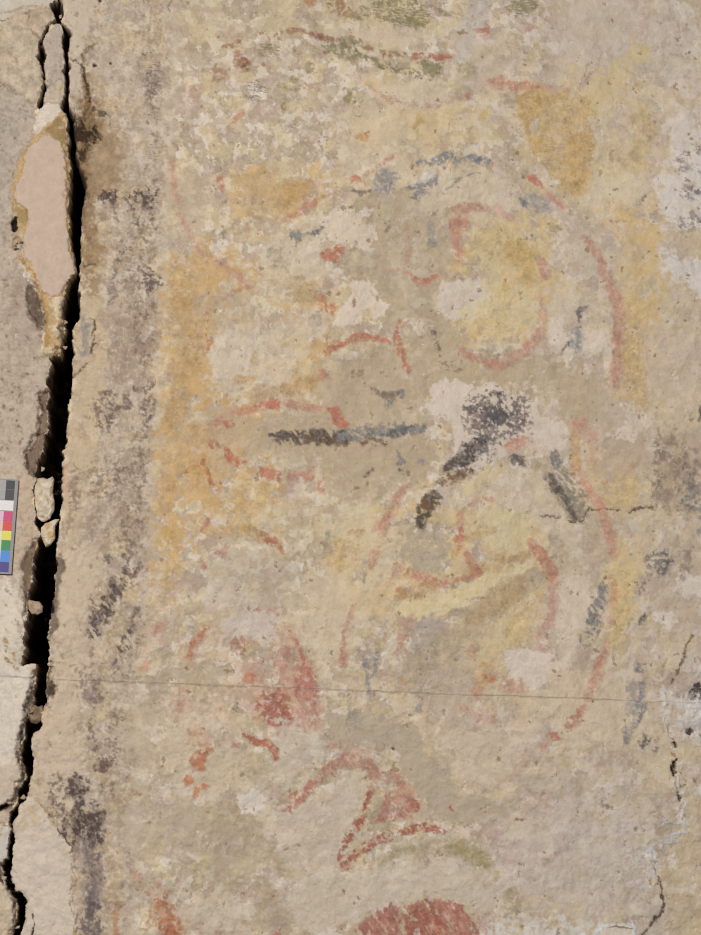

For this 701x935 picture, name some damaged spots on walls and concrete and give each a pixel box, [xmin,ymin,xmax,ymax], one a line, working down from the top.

spalling [0,0,81,359]
crack [0,0,109,935]
crack [656,602,701,686]
crack [662,713,684,810]
peeling [0,794,80,935]
spalling [580,918,639,935]
crack [629,857,666,935]